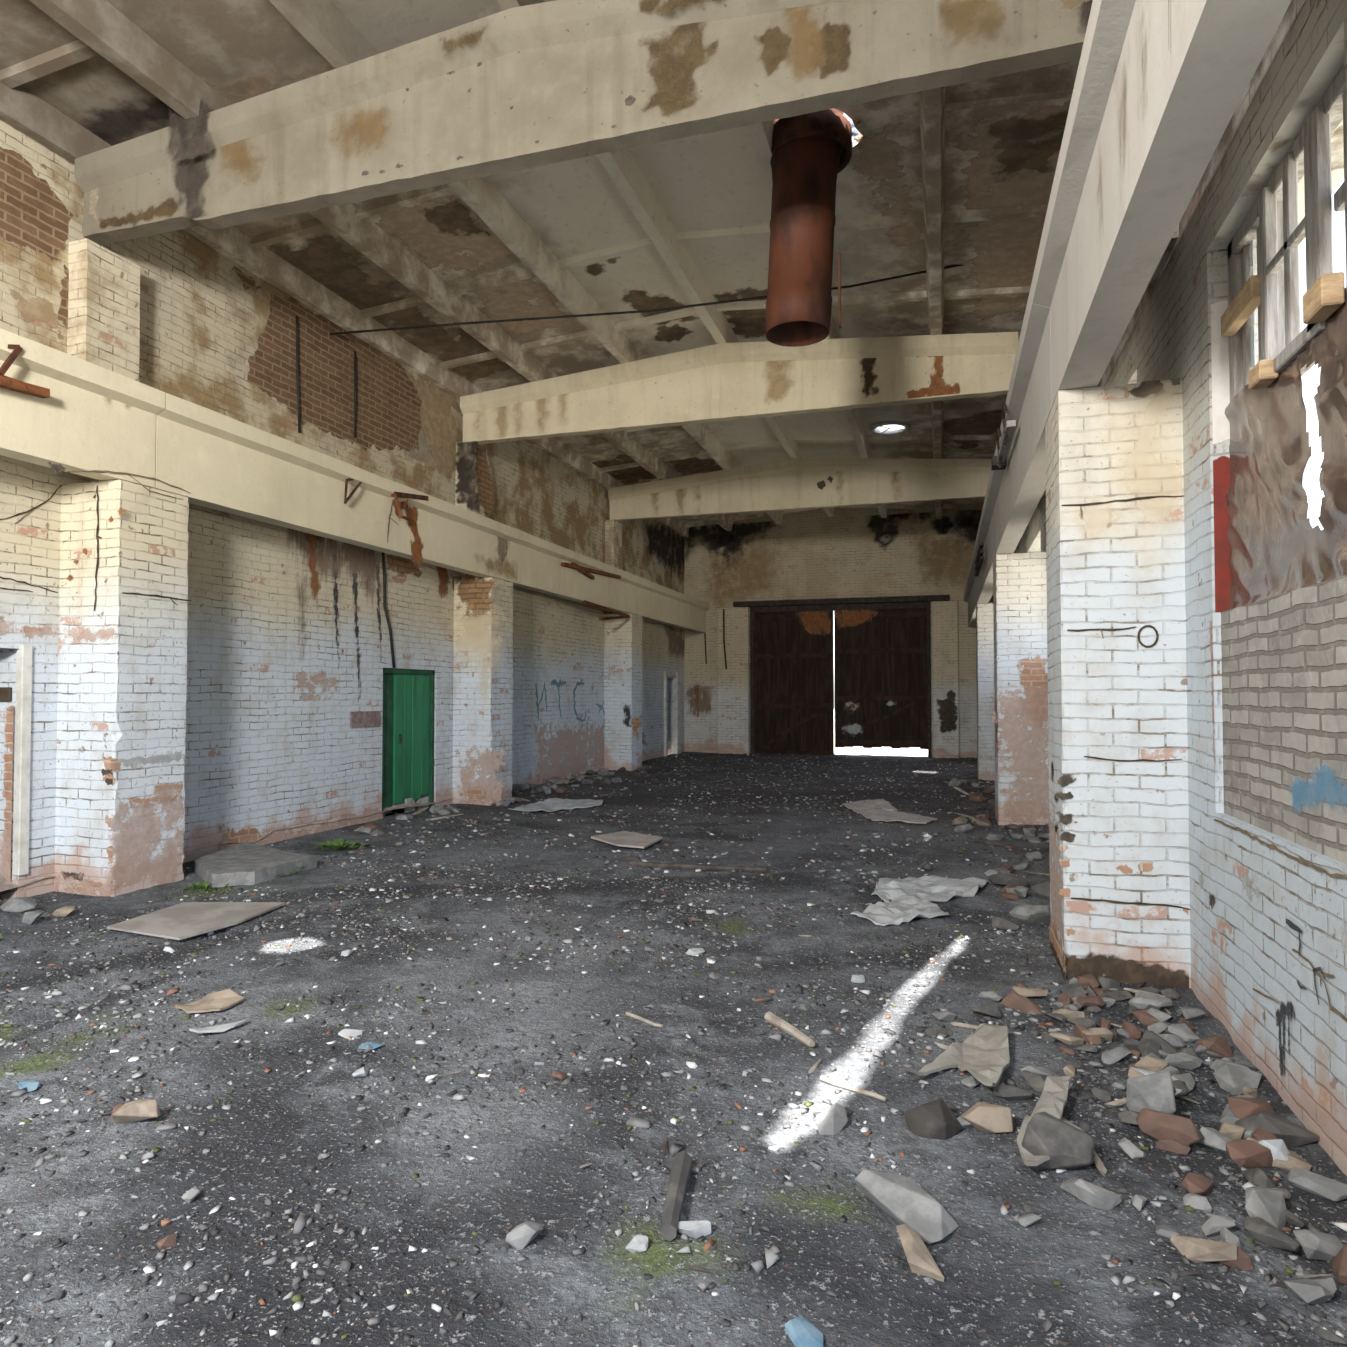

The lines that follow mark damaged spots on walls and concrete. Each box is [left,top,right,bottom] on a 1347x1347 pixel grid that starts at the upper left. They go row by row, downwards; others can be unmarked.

water stain [640,0,720,115]
water stain [758,7,851,78]
water stain [940,0,1002,37]
peeling [0,147,178,328]
flaking render [232,266,463,482]
spalling [1128,378,1180,398]
crack [0,470,191,611]
rust [393,500,497,620]
water stain [593,454,684,576]
water stain [920,516,971,580]
spalling [101,752,184,785]
peeling [55,781,185,896]